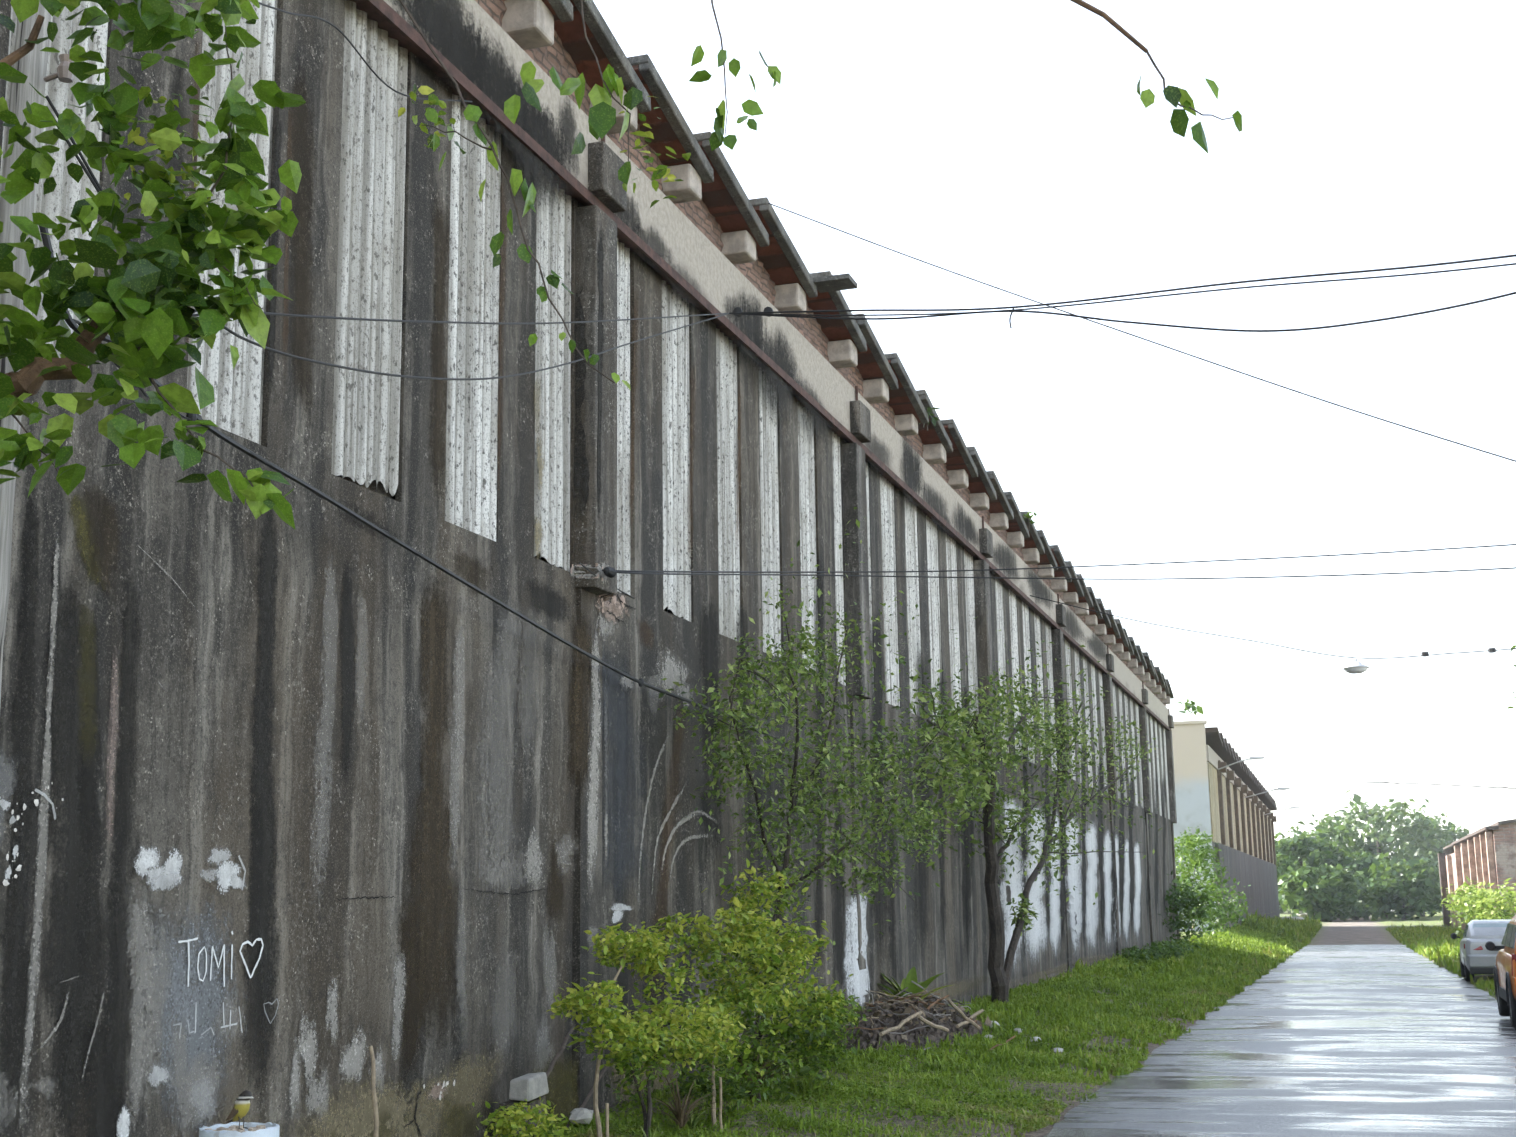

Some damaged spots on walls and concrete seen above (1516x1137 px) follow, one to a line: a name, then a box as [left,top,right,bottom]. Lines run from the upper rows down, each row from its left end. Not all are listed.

leakage [266,80,315,404]
leakage [430,199,449,485]
leakage [573,231,605,518]
leakage [726,293,829,440]
leakage [866,436,1107,660]
leakage [1,489,280,1137]
leakage [289,565,465,1117]
leakage [532,583,722,899]
leakage [815,562,845,992]
leakage [870,615,898,982]
leakage [914,654,973,947]
leakage [1021,745,1166,952]